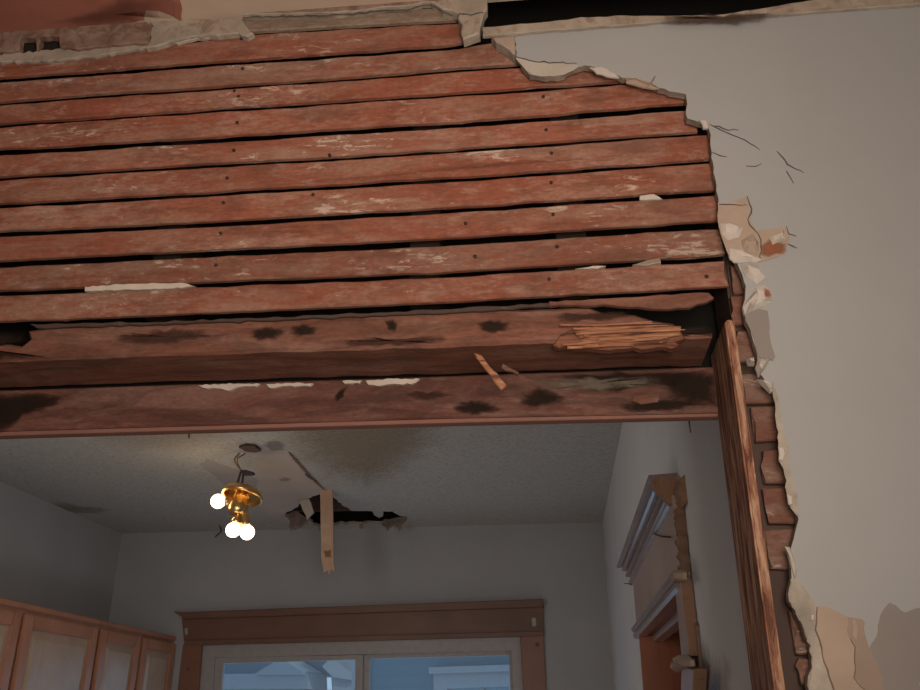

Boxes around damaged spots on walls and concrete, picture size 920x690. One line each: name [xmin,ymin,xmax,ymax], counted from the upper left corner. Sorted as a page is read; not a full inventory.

crack [710,124,804,184]
spalling [717,196,797,263]
spalling [85,283,196,293]
leakage [254,328,282,340]
leakage [350,321,442,345]
leakage [481,321,506,332]
peeling [198,382,314,392]
peeling [343,378,420,387]
leakage [524,389,561,406]
leakage [456,401,498,414]
peeling [744,309,798,516]
peeling [784,546,920,690]